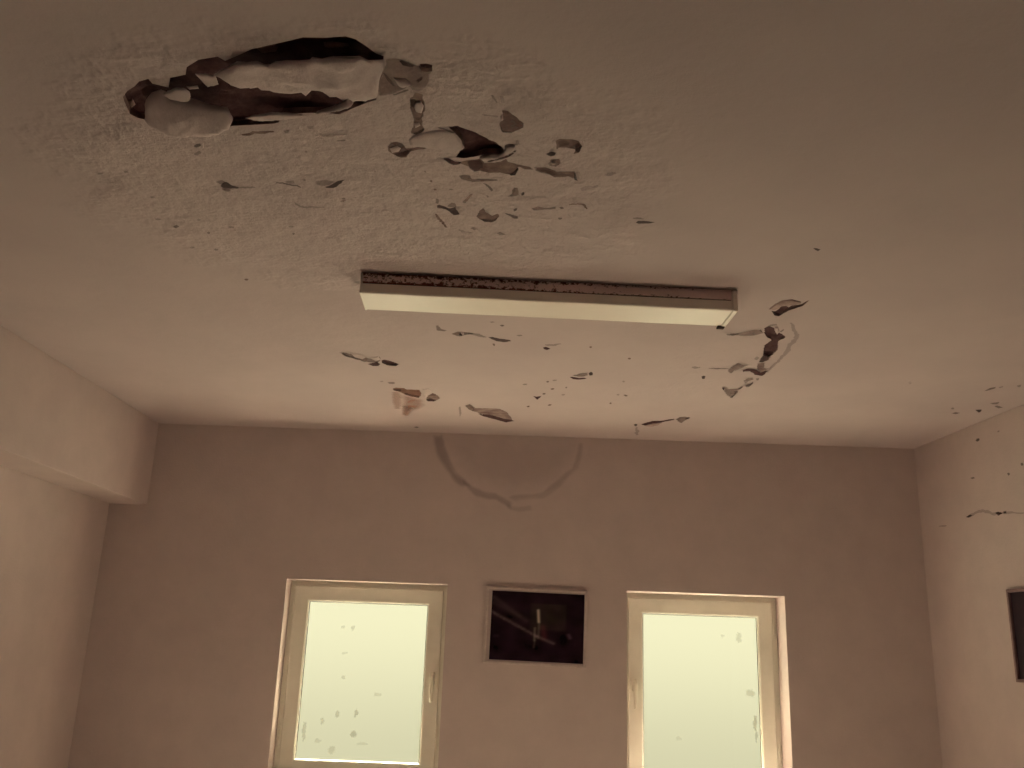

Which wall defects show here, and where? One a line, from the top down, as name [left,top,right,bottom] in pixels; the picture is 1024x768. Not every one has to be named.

spalling [123,36,585,222]
spalling [702,299,808,398]
peeling [342,352,398,366]
peeling [393,388,439,402]
peeling [465,404,512,422]
peeling [634,417,688,427]